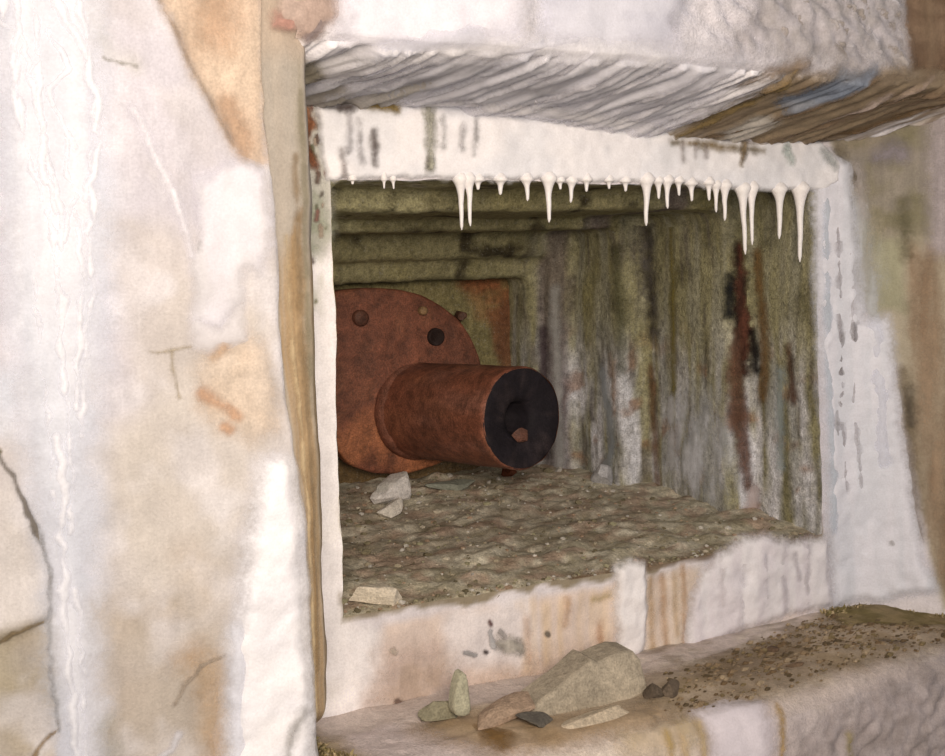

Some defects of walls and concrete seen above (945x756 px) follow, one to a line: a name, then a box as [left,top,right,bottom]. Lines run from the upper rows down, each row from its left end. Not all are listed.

corrosion [307,106,316,137]
corrosion [309,150,319,170]
leakage [286,31,945,723]
crack [0,456,60,756]